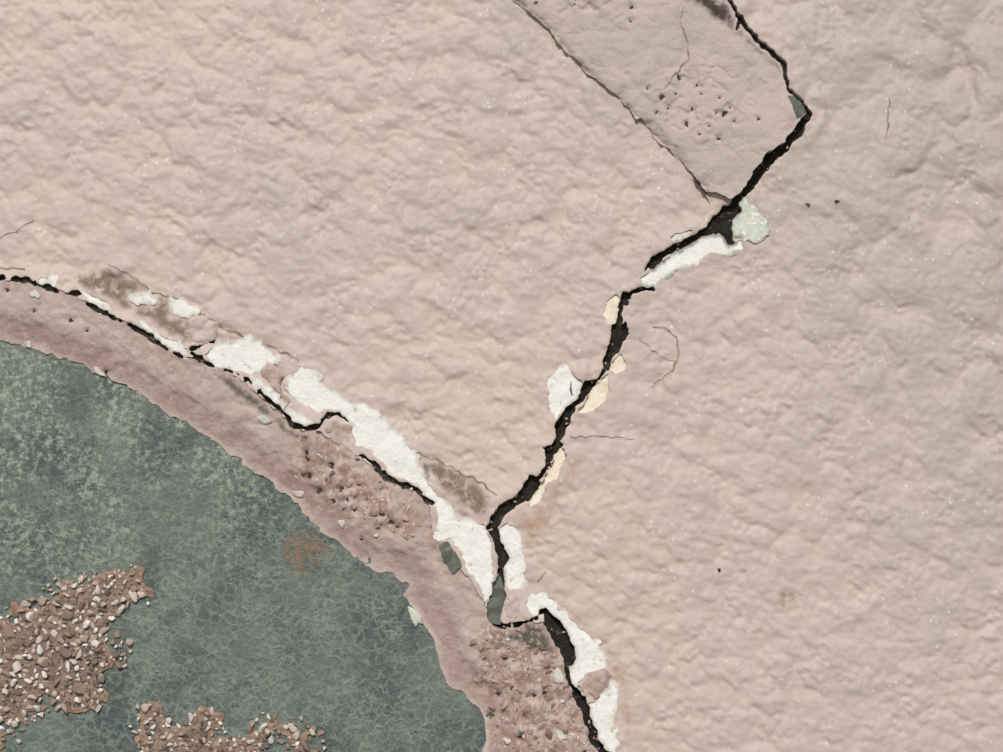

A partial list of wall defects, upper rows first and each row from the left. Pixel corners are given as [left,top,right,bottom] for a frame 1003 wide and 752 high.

peeling [29,271,58,313]
peeling [80,291,111,315]
crack [0,264,349,432]
crack [416,0,811,587]
peeling [128,290,626,752]
crack [359,454,435,505]
spalling [0,564,154,752]
crack [492,608,609,752]